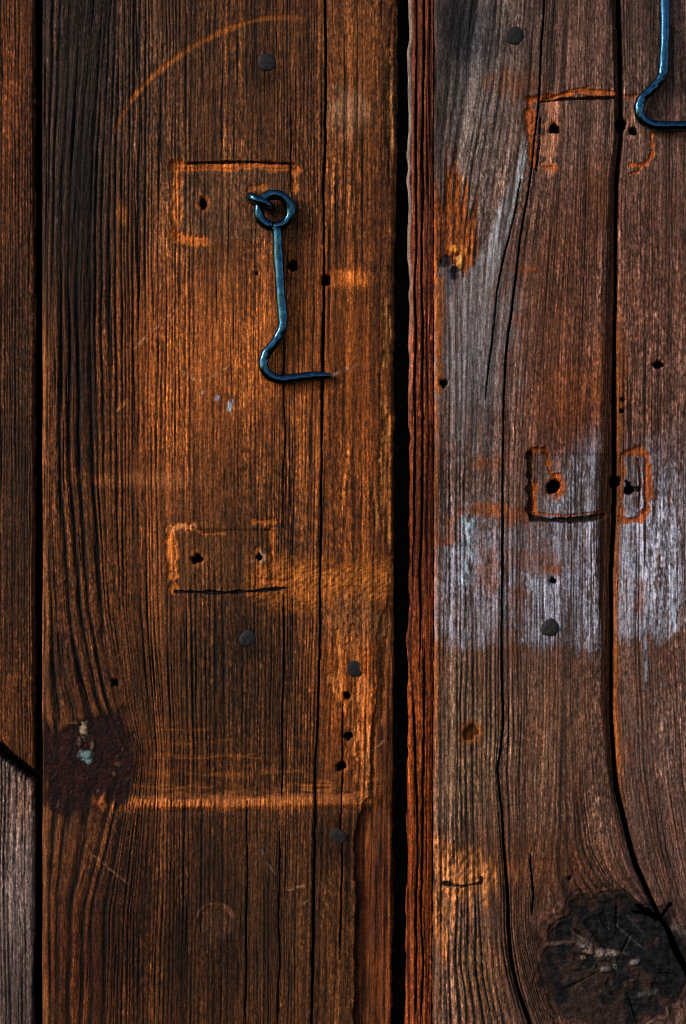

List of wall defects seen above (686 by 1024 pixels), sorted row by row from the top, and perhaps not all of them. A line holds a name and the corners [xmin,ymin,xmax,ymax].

crack [485,0,545,1024]
crack [597,0,686,975]